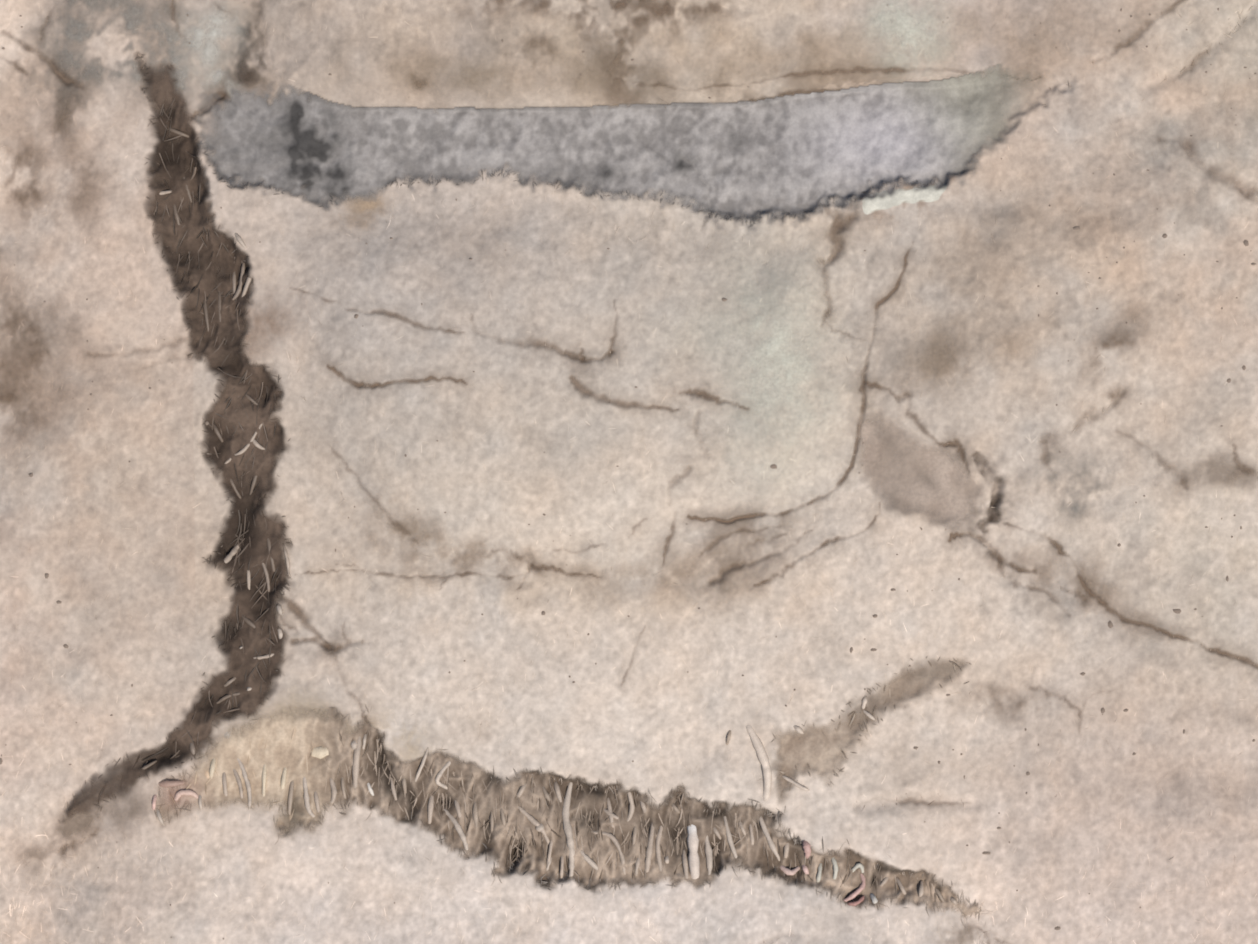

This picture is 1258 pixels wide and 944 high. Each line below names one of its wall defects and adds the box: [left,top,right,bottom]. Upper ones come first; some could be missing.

peeling [200,69,1011,228]
crack [875,253,908,309]
crack [327,365,466,388]
crack [535,340,747,410]
crack [839,368,882,484]
crack [914,416,965,462]
crack [288,602,341,651]
crack [508,565,595,579]
crack [664,500,814,586]
crack [993,554,1035,572]
crack [1051,541,1258,668]
peeling [746,656,972,802]